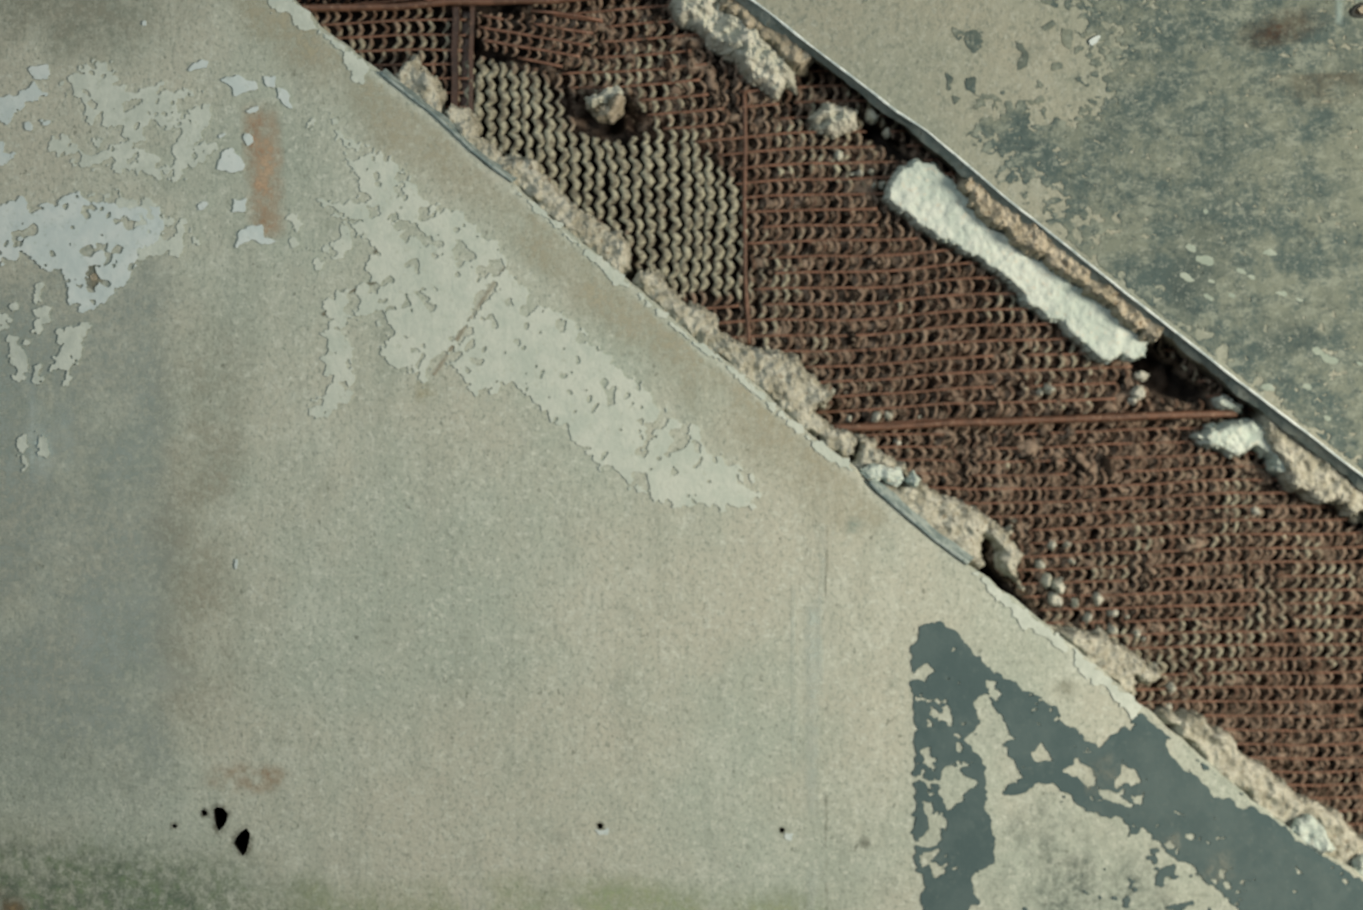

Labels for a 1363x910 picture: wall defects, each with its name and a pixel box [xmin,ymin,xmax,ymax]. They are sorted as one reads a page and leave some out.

peeling [17,431,50,472]
peeling [0,59,254,386]
peeling [221,75,293,114]
peeling [268,0,372,31]
peeling [232,113,762,512]
flaking render [313,0,1363,910]